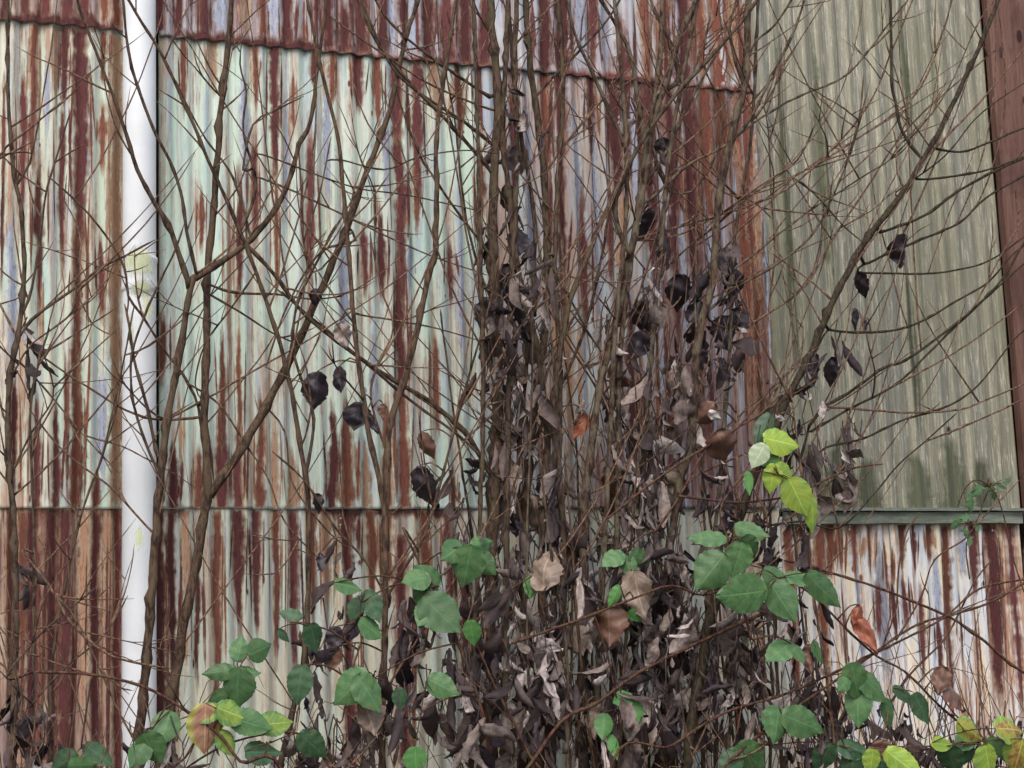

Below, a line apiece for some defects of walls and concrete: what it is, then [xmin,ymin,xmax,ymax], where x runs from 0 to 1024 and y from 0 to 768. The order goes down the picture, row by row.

rust [0,0,123,768]
rust [156,0,491,717]
rust [344,704,363,768]
rust [398,666,417,768]
rust [530,0,776,475]
rust [781,524,1024,711]